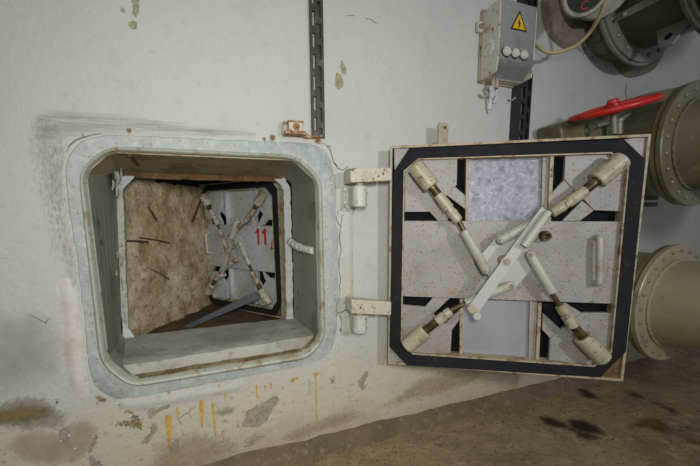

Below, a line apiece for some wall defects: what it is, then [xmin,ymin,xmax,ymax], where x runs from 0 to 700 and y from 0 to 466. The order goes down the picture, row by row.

peeling [335,61,346,89]
crack [336,207,356,319]
water stain [0,399,62,428]
peeling [114,402,170,443]
corrosion [165,407,178,461]
spalling [242,396,280,427]